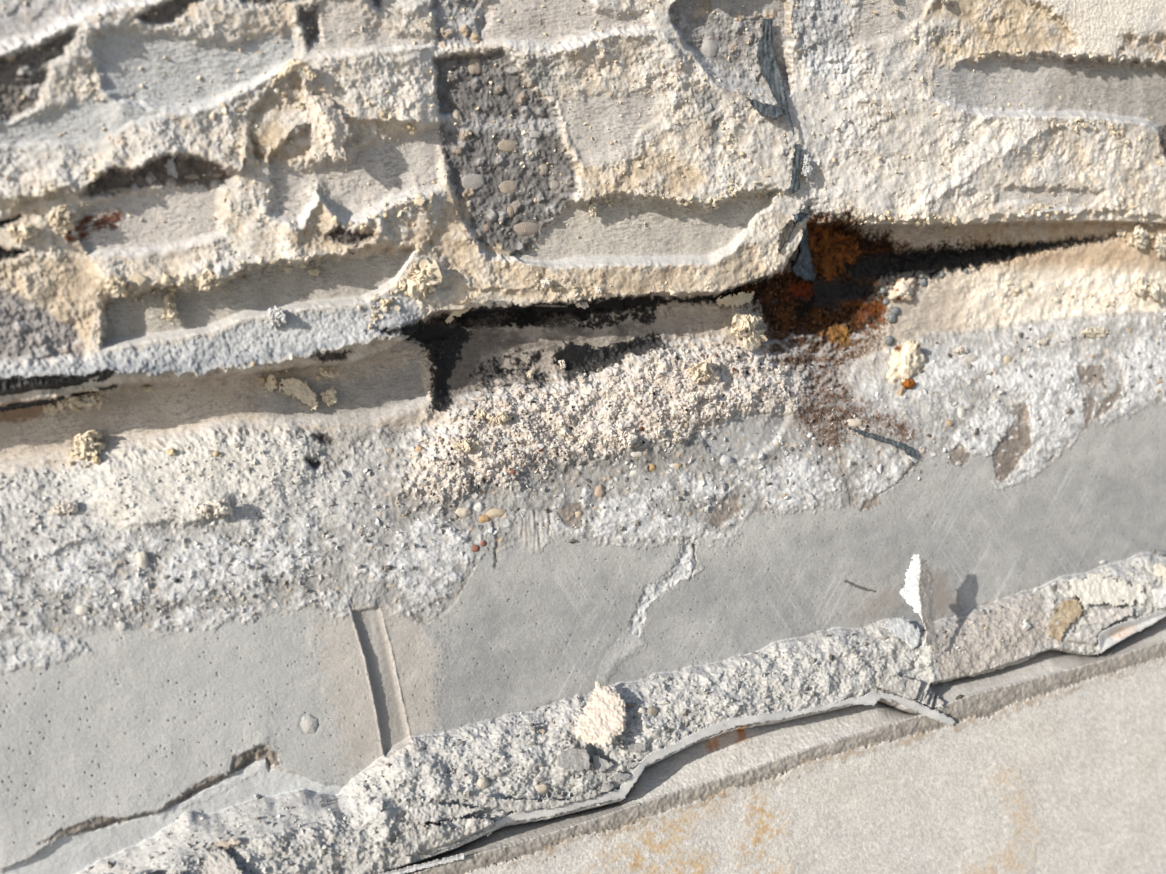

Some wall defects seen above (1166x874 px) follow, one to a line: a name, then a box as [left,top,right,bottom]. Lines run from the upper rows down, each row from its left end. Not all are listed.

spalling [0,0,1166,368]
spalling [0,308,1166,674]
crack [594,539,704,686]
rust [717,197,1122,461]